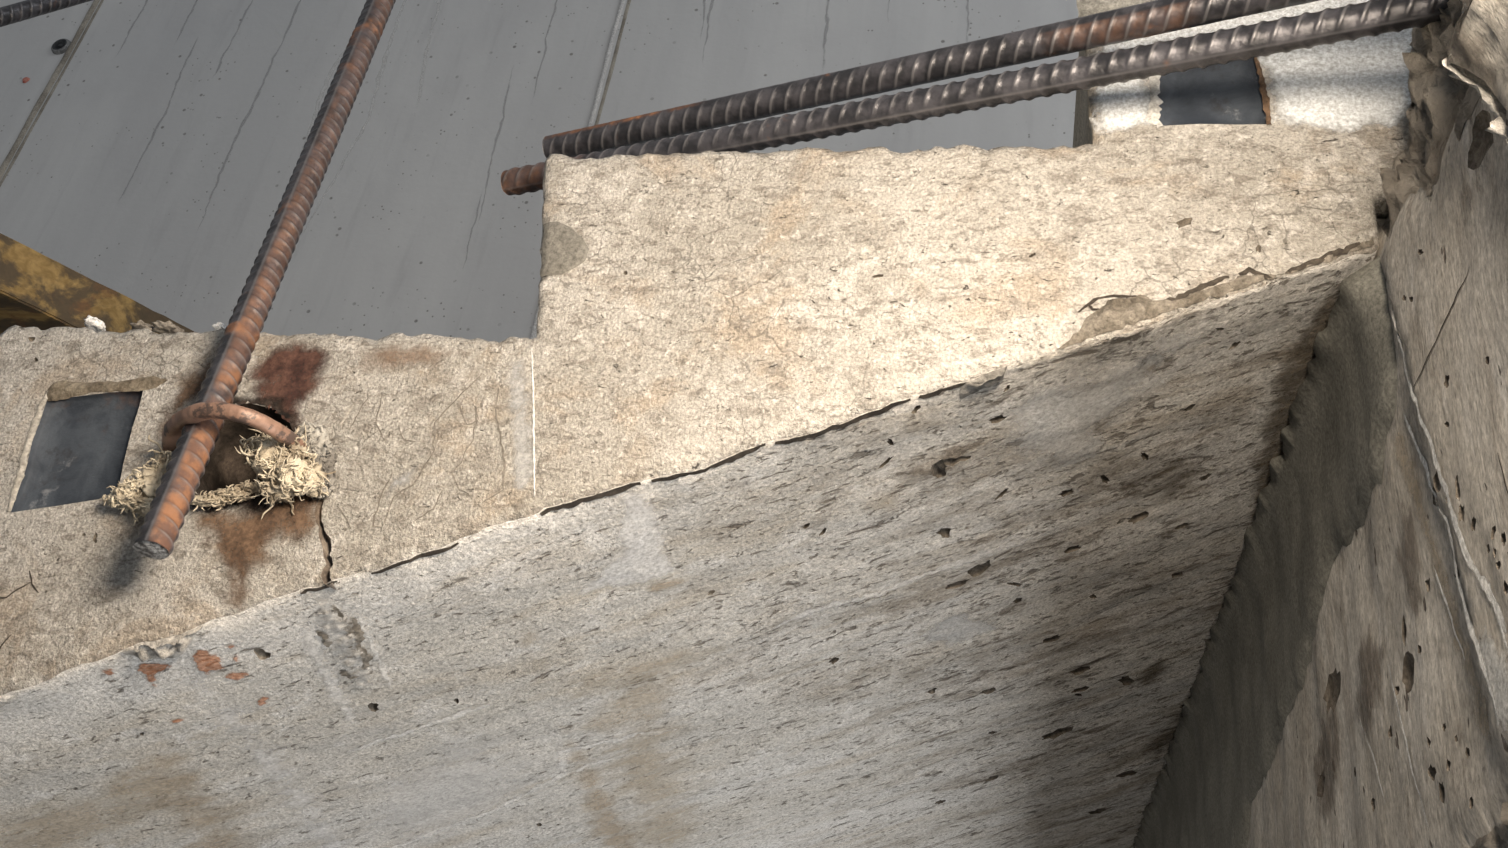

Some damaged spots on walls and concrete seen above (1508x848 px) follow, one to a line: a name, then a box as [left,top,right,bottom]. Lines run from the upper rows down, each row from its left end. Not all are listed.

spalling [1454,89,1494,170]
corrosion [162,365,210,432]
corrosion [252,345,327,427]
crack [300,374,506,595]
corrosion [201,493,315,604]